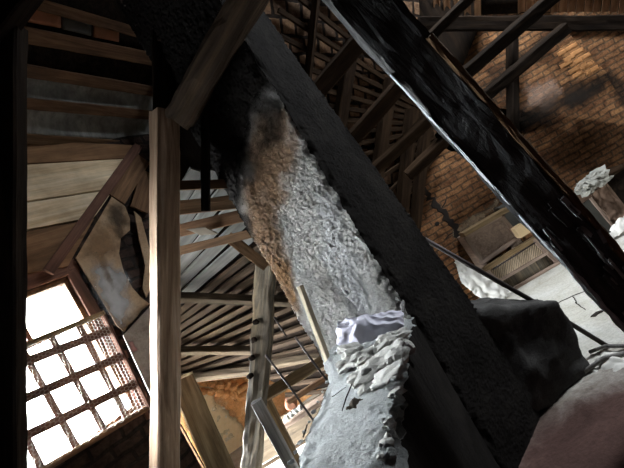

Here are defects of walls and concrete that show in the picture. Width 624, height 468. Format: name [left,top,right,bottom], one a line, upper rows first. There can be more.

leakage [262,100,283,147]
crack [425,187,460,240]
flaking render [338,337,405,374]
spalling [370,357,409,462]